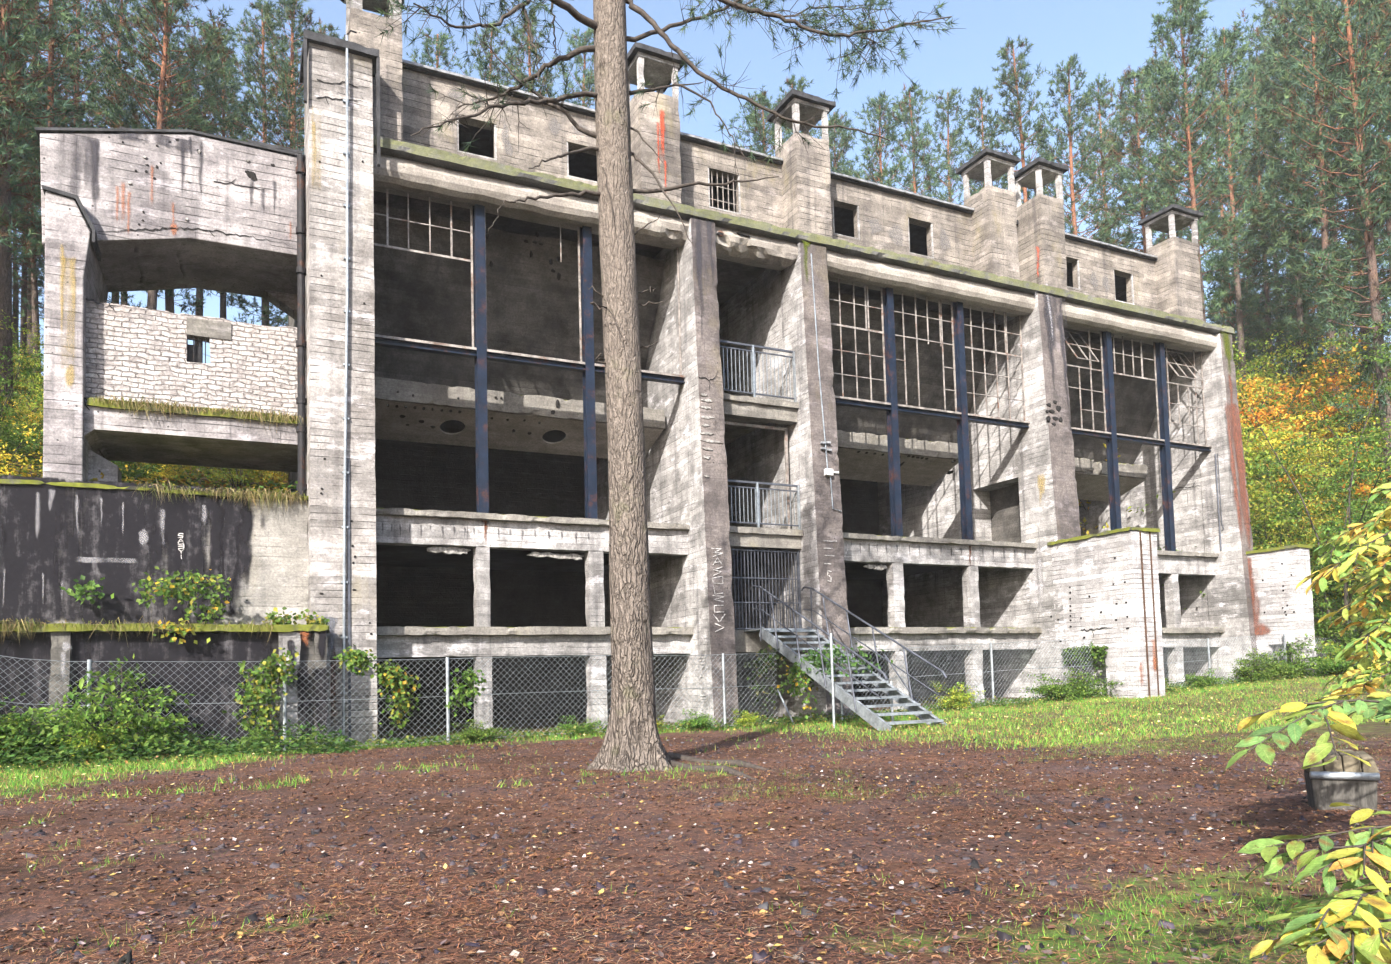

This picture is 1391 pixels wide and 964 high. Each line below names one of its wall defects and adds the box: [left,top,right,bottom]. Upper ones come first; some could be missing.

leakage [71,138,99,202]
corrosion [657,110,666,187]
corrosion [1226,375,1250,539]
leakage [0,475,336,753]
corrosion [1247,558,1270,636]